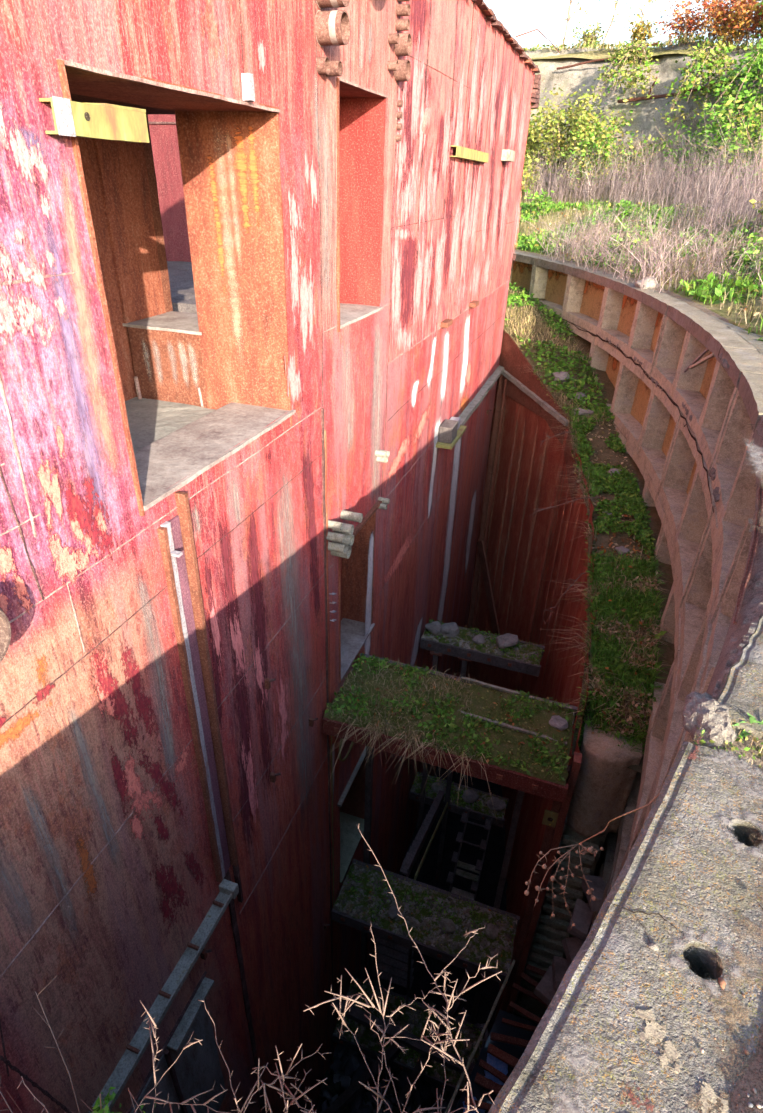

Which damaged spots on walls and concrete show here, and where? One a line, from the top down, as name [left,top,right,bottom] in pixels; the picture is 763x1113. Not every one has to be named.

peeling [0,89,52,222]
corrosion [207,156,224,277]
corrosion [233,125,261,233]
peeling [0,226,69,350]
peeling [35,425,118,589]
spalling [682,419,763,747]
corrosion [0,654,55,749]
peeling [73,632,208,934]